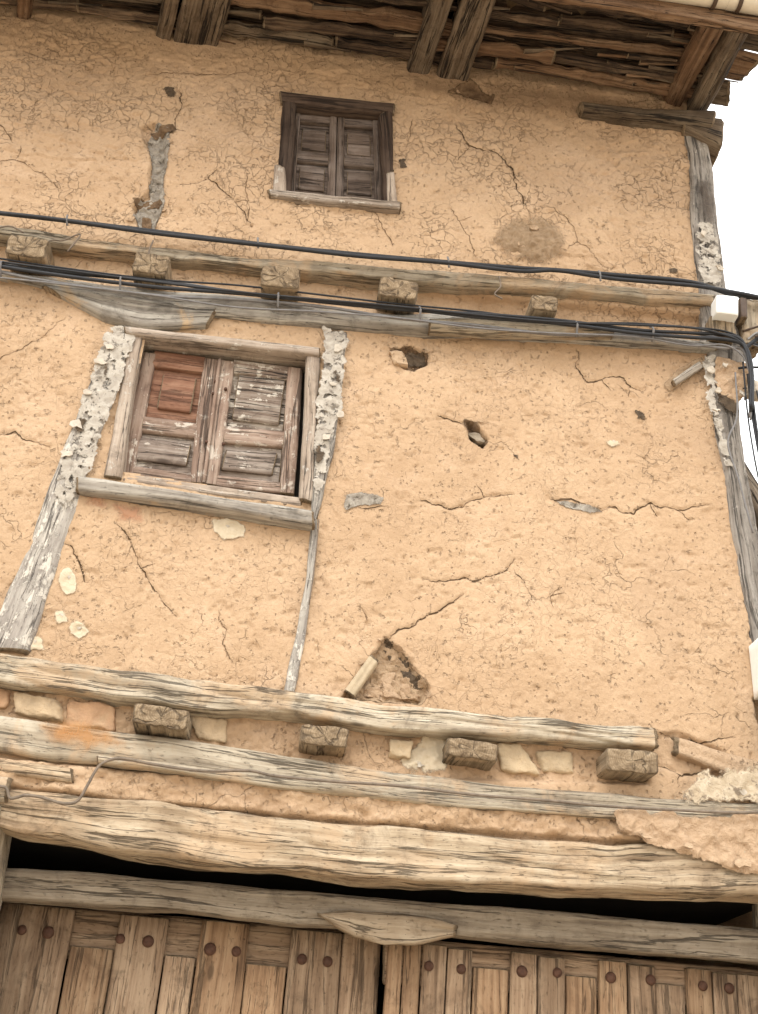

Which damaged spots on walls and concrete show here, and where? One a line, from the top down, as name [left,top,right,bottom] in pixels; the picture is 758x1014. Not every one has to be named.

flaking render [127,122,175,229]
crack [456,125,531,220]
flaking render [388,342,430,372]
flaking render [464,419,487,448]
crack [421,484,511,510]
crack [602,502,704,520]
crack [388,559,561,640]
flaking render [344,638,432,705]
flaking render [614,764,758,874]